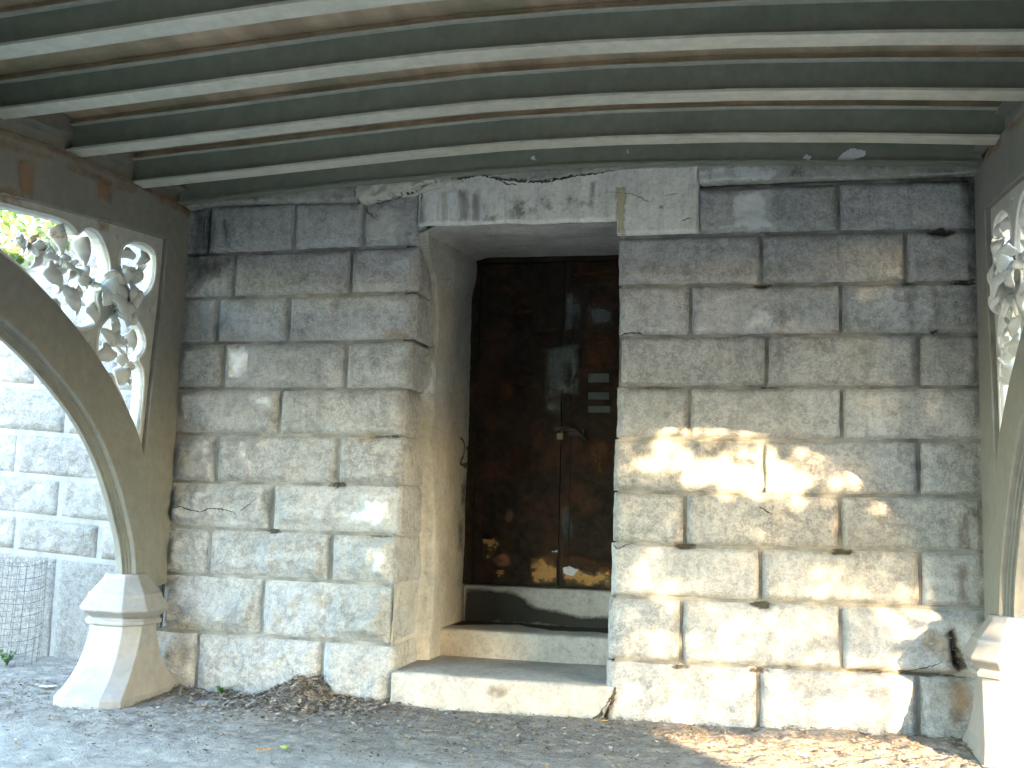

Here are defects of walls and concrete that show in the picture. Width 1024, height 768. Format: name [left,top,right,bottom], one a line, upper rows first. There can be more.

spalling [354,178,463,206]
crack [358,170,677,220]
crack [172,497,259,517]
spalling [923,629,967,670]
crack [592,687,616,719]